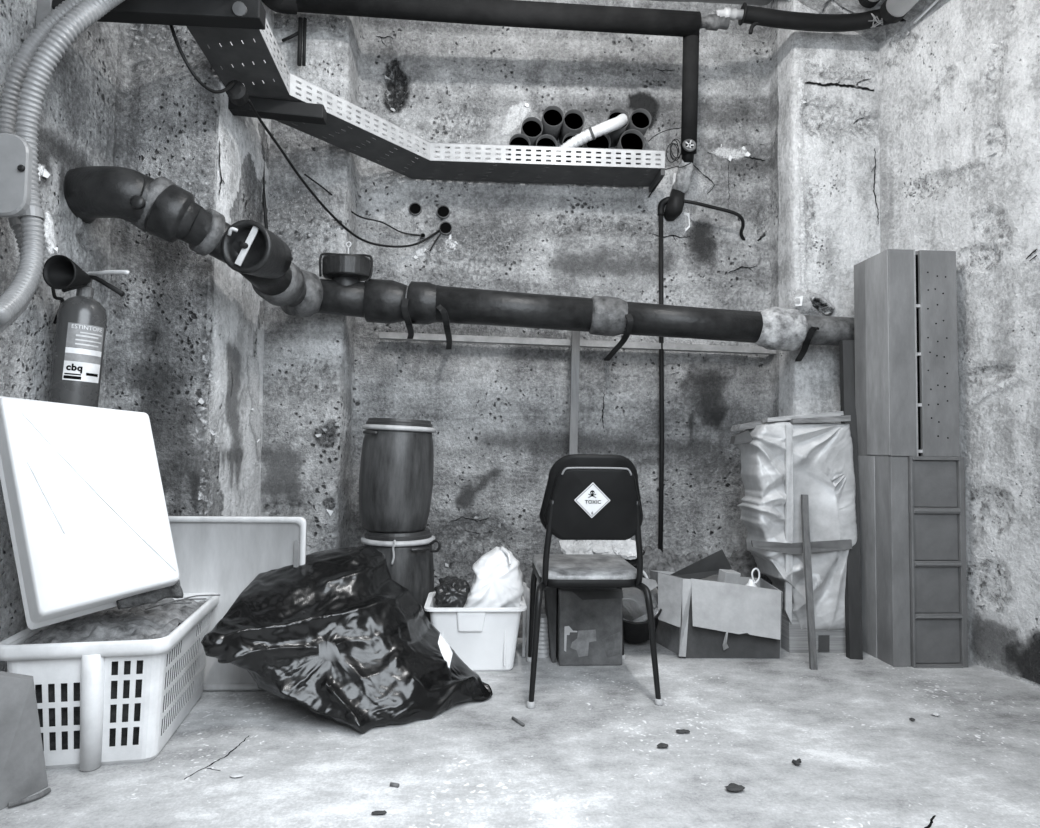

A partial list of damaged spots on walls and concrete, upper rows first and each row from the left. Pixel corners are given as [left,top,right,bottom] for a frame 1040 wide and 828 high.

crack [803,78,874,91]
peeling [711,144,750,162]
crack [871,148,879,224]
leakage [136,368,202,494]
leakage [1006,631,1040,684]